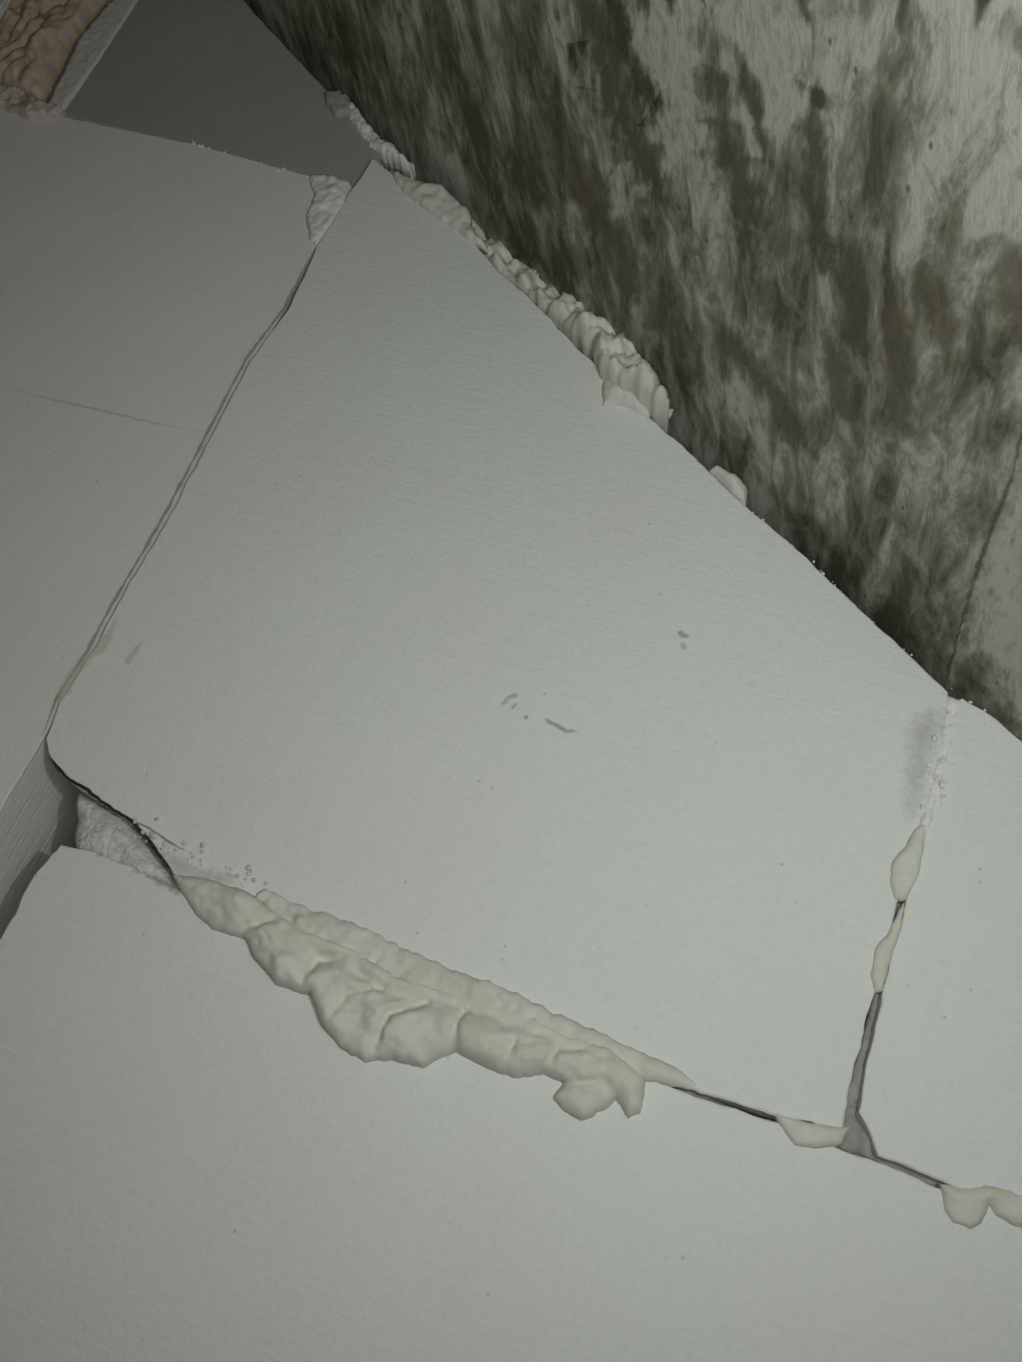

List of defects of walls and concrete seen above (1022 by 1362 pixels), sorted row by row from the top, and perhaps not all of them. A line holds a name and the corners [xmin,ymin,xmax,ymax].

damp [557,0,670,206]
damp [700,39,772,239]
damp [798,88,834,275]
damp [899,0,908,27]
damp [976,0,988,23]
crack [49,272,302,718]
crack [50,757,182,871]